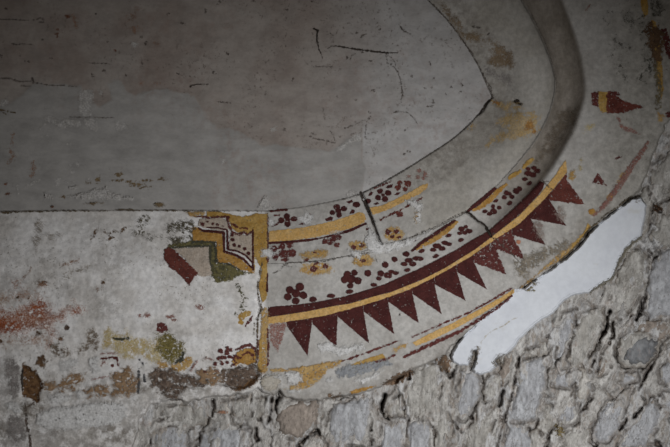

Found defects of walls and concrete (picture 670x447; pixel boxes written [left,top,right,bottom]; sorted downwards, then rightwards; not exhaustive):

crack [254,1,494,368]
crack [401,210,520,262]
flaking render [590,236,642,293]
flaking render [148,363,307,403]
flaking render [318,342,366,356]
flaking render [354,367,414,385]
flaking render [436,355,452,373]